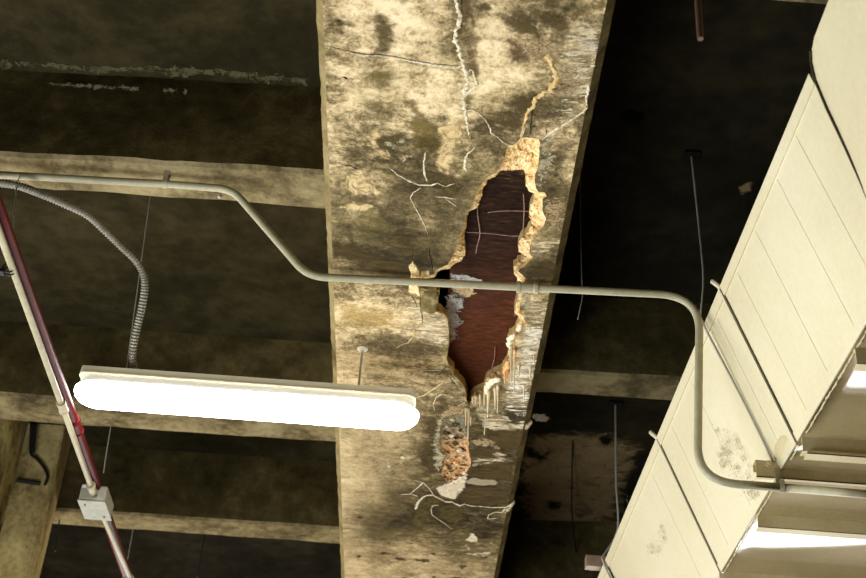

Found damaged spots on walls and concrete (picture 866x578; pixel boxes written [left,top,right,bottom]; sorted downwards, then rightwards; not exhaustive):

water stain [374,15,394,55]
water stain [458,0,491,77]
water stain [377,101,440,152]
peeling [436,121,462,174]
crack [333,0,593,270]
water stain [470,97,533,133]
water stain [505,2,605,187]
water stain [333,245,410,278]
spalling [409,138,560,403]
water stain [413,293,641,525]
spalling [441,415,471,483]
crack [401,480,513,532]